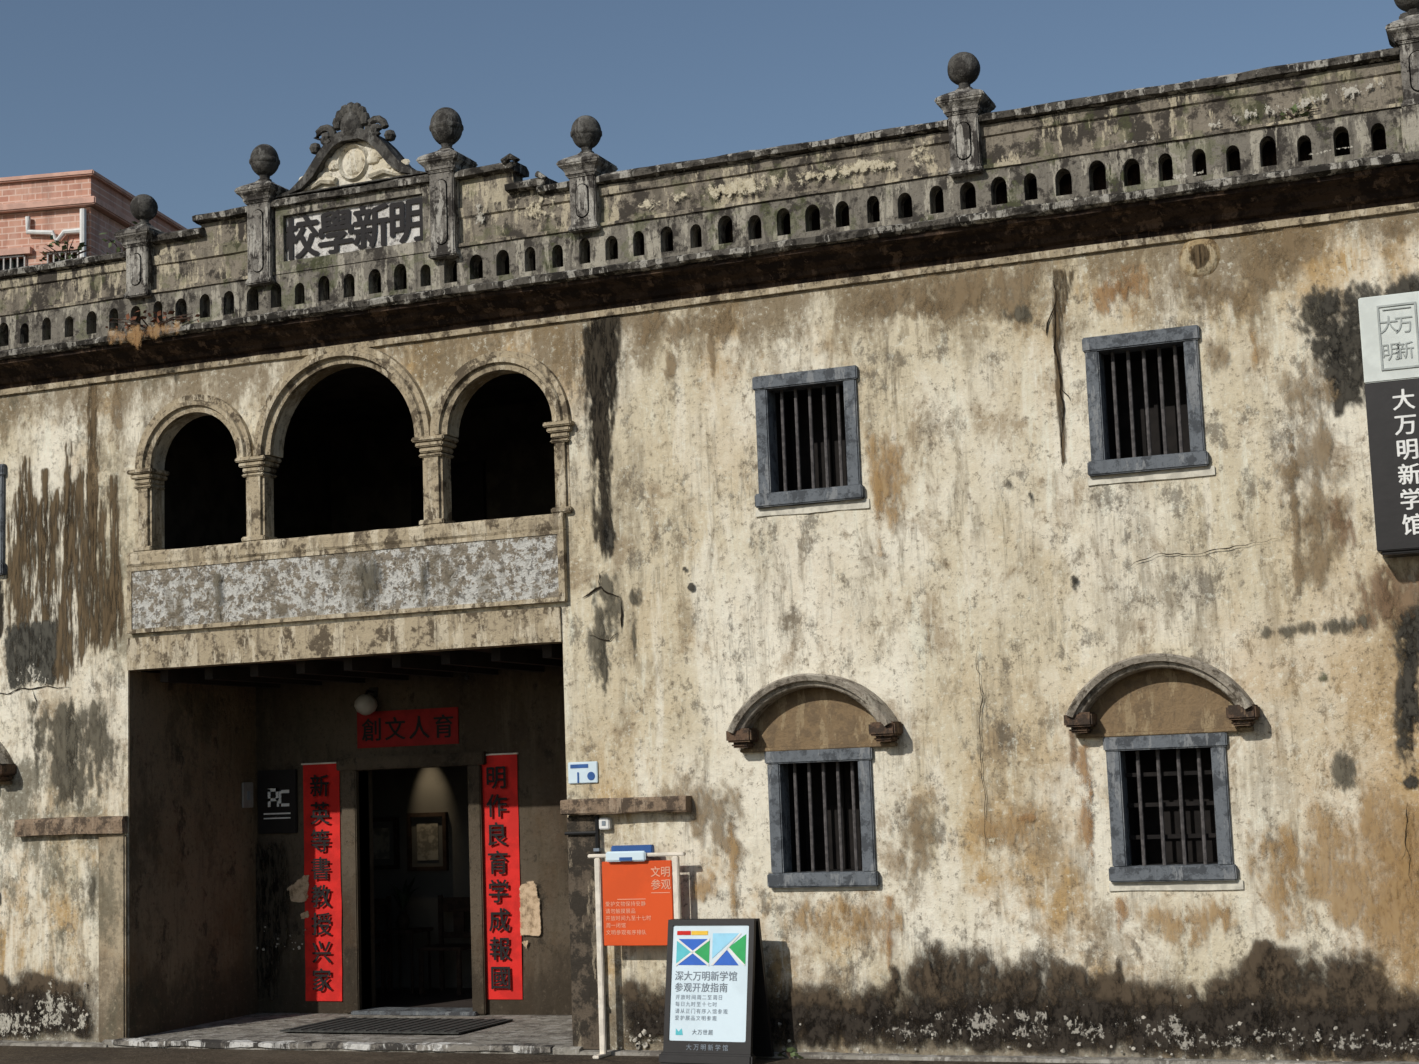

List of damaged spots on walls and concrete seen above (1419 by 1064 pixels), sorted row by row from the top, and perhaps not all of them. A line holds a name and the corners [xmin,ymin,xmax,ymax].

water stain [0,381,124,809]
water stain [571,315,641,691]
water stain [641,312,695,380]
water stain [868,435,907,527]
water stain [1273,273,1419,590]
water stain [768,606,1419,1060]
water stain [0,971,92,1037]
water stain [617,979,665,1043]